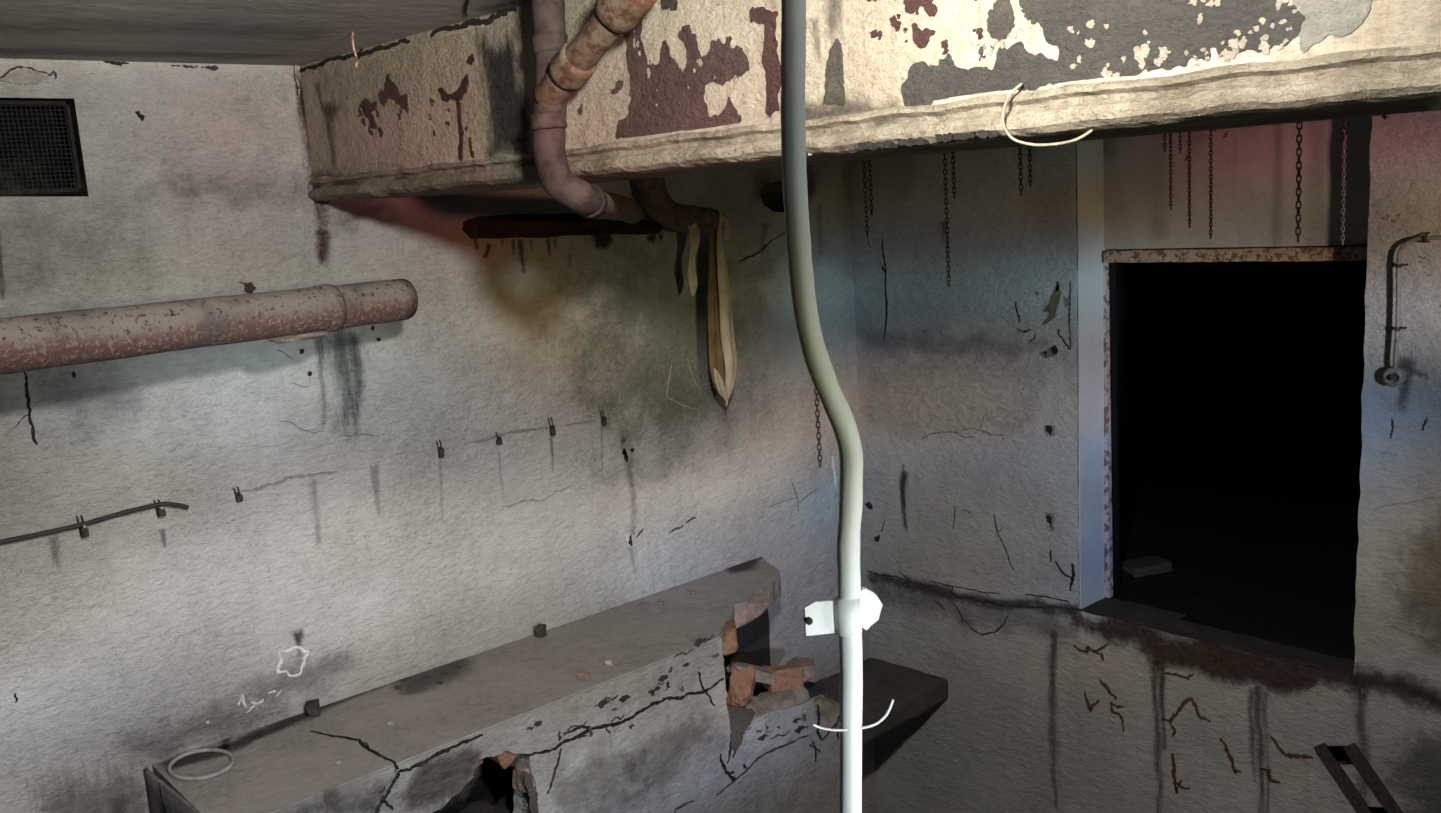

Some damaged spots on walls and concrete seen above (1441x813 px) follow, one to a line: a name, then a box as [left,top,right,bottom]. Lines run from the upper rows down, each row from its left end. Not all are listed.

peeling [660,0,678,11]
peeling [611,7,781,139]
peeling [823,0,845,105]
peeling [870,0,1372,106]
rust [268,331,328,344]
crack [12,372,38,445]
crack [866,506,1125,732]
crack [310,730,483,813]
crack [526,671,839,813]
spalling [726,659,817,757]
leakage [1152,662,1166,771]
crack [1161,672,1313,793]